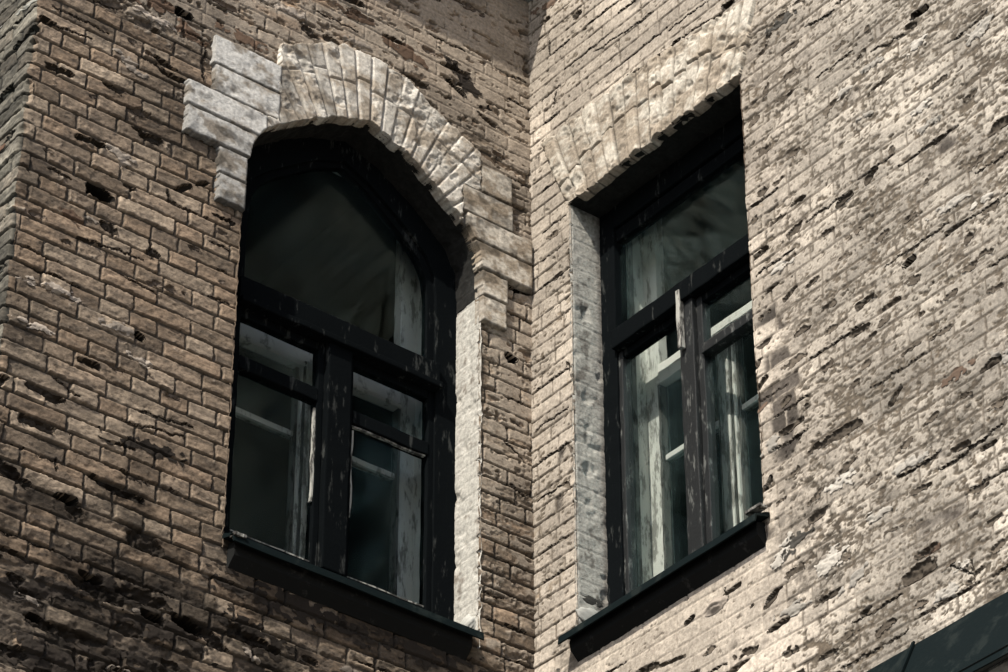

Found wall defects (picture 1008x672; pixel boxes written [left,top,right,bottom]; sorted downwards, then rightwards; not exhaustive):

spalling [128,38,186,84]
spalling [422,45,472,98]
spalling [987,115,1008,137]
spalling [85,182,115,203]
crack [507,368,569,406]
spalling [771,403,810,438]
spalling [0,458,32,490]
crack [503,441,570,503]
spalling [52,492,84,518]
spalling [22,612,91,646]
spalling [68,568,281,655]
spalling [638,654,686,672]